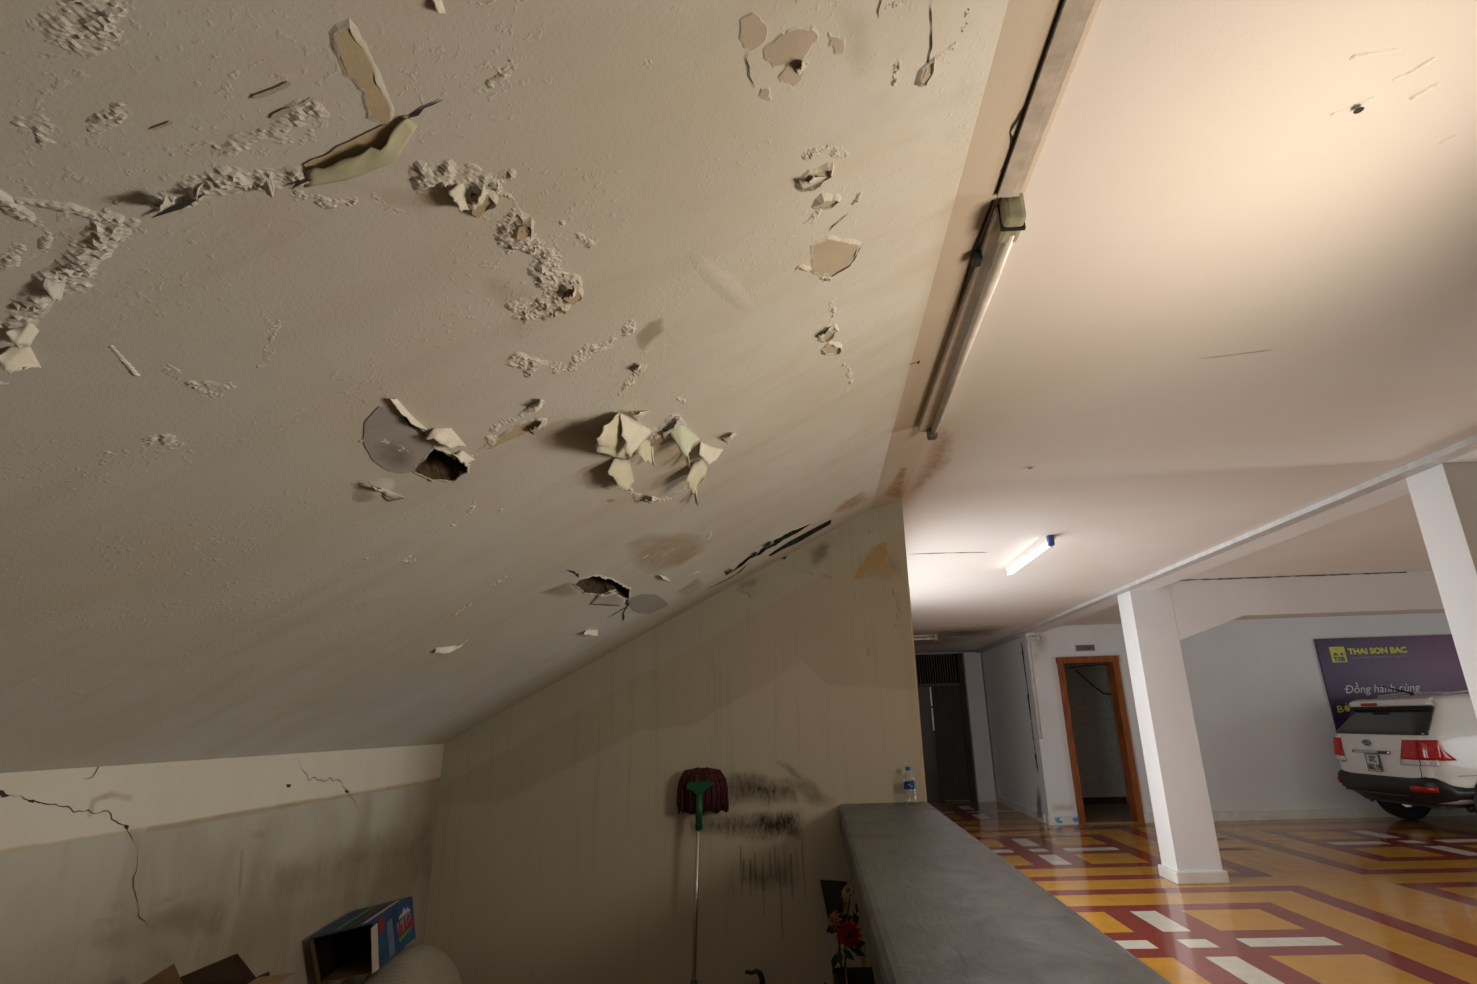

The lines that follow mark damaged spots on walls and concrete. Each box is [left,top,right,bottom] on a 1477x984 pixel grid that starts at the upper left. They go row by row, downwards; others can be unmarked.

peeling [35,0,129,57]
peeling [738,11,846,102]
peeling [0,18,584,387]
peeling [794,144,862,396]
peeling [504,320,637,378]
spalling [358,398,547,482]
peeling [595,364,737,506]
crack [706,520,831,590]
spalling [553,570,669,636]
crack [0,766,149,928]